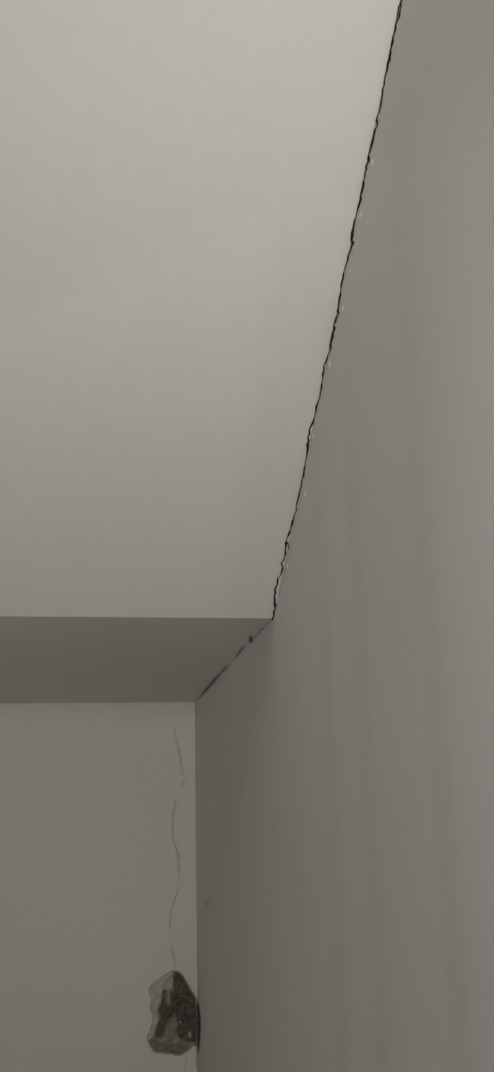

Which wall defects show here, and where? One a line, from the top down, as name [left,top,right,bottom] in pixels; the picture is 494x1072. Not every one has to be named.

crack [200,0,402,697]
spalling [146,970,201,1056]